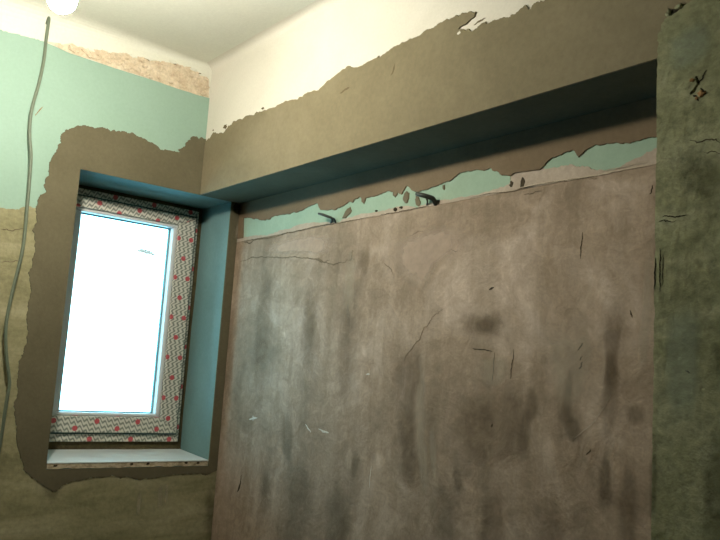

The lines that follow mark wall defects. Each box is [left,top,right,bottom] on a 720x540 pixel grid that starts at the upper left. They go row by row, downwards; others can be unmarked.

spalling [48,42,210,98]
peeling [543,137,657,171]
peeling [244,168,510,237]
crack [471,176,597,198]
crack [244,206,425,266]
crack [654,251,664,287]